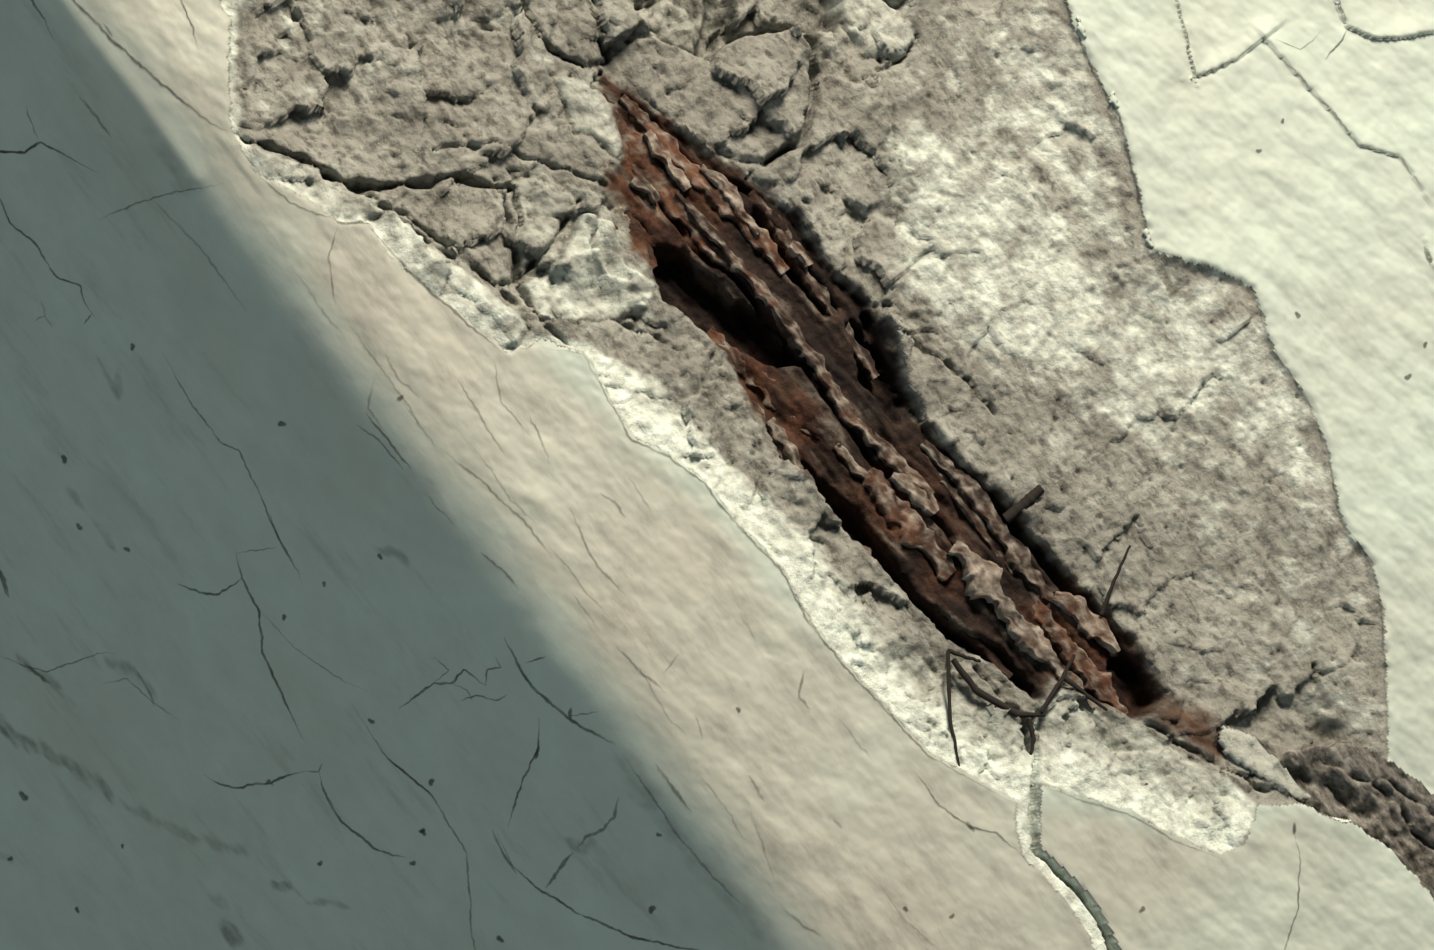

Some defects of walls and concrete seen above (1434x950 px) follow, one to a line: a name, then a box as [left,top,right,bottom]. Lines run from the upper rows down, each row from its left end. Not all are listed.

crack [73,0,184,103]
crack [1,142,57,153]
crack [7,218,82,289]
spalling [219,0,1390,856]
corrosion [598,71,1169,720]
crack [190,585,289,710]
crack [518,666,593,733]
crack [220,774,290,789]
crack [514,740,539,807]
crack [338,817,382,852]
crack [1014,784,1122,950]
crack [529,880,684,949]